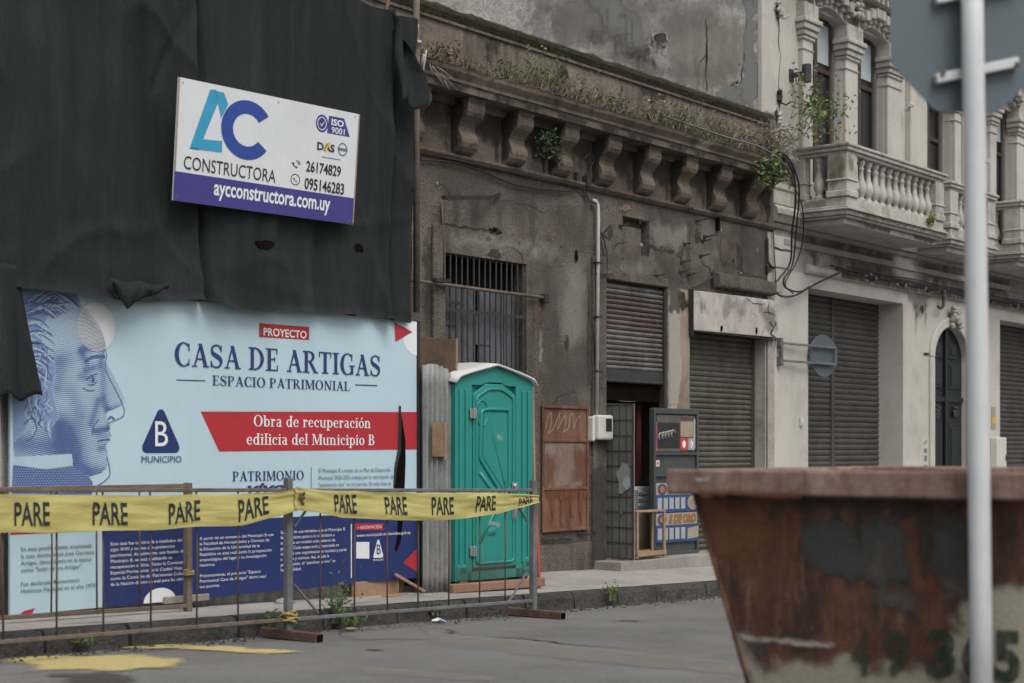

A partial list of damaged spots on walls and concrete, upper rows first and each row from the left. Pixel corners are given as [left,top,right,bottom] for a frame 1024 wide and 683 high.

crack [700,18,745,92]